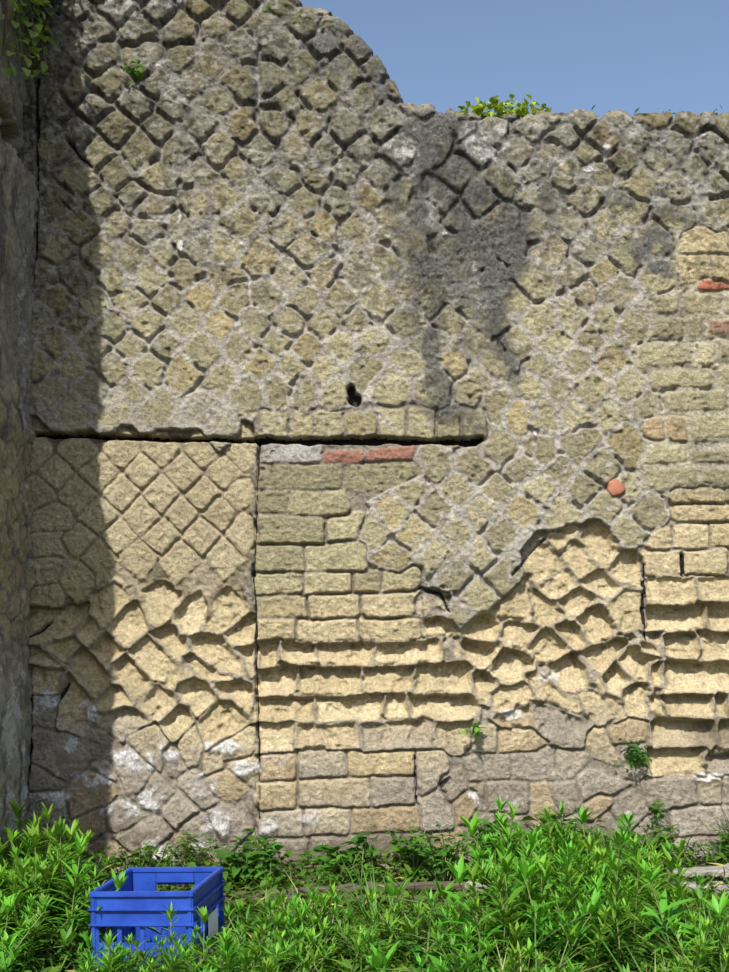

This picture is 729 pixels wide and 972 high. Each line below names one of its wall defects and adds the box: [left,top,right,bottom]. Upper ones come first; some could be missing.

leakage [302,19,395,107]
crack [33,80,41,279]
leakage [391,108,529,429]
crack [35,434,484,820]
crack [512,539,546,576]
crack [639,564,647,641]
crack [678,554,686,577]
crack [26,687,34,785]